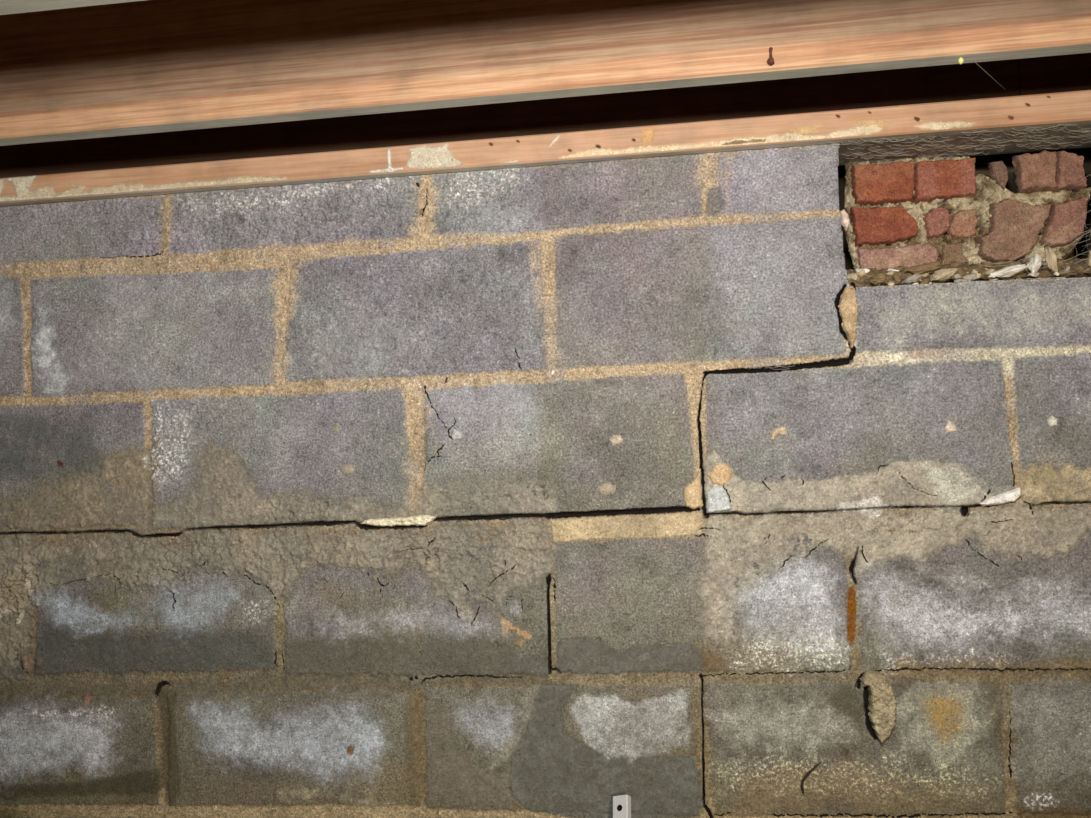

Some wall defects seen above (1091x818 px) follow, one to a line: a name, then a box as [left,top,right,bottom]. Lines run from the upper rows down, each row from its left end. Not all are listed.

spalling [838,165,846,211]
spalling [841,225,854,270]
spalling [969,147,1091,260]
crack [0,282,1091,570]
spalling [706,486,731,513]
crack [449,560,561,674]
water stain [287,559,863,818]
rust [847,587,856,643]
crack [849,546,868,584]
water stain [731,685,1001,800]
crack [699,666,1091,818]
water stain [867,575,1091,711]